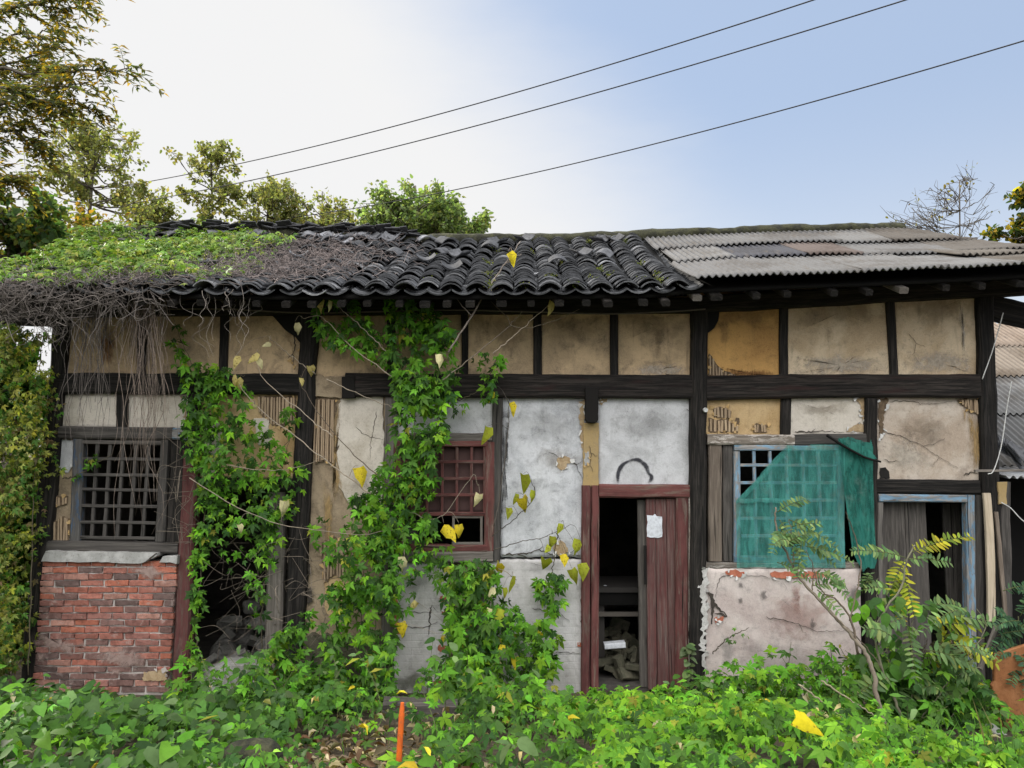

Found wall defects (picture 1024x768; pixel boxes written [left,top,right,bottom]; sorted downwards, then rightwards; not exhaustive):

flaking render [556,399,591,471]
crack [885,432,979,476]
spalling [725,569,747,580]
spalling [770,570,826,581]
crack [766,616,842,633]